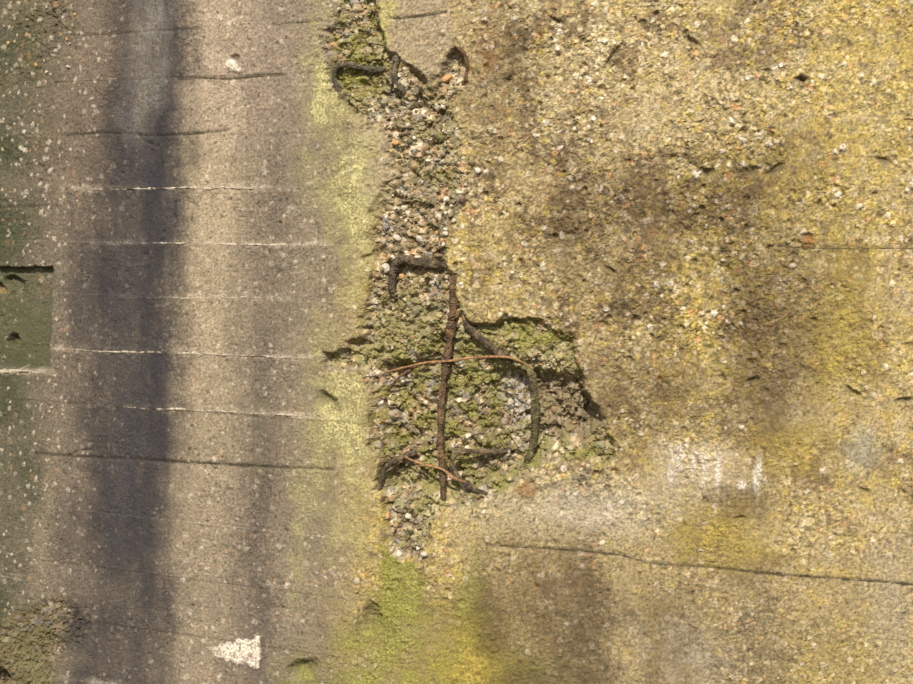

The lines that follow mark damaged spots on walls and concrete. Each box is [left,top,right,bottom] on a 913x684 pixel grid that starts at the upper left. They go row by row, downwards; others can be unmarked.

spalling [603,44,622,70]
spalling [317,0,616,569]
crack [498,543,913,586]
spalling [0,594,96,684]